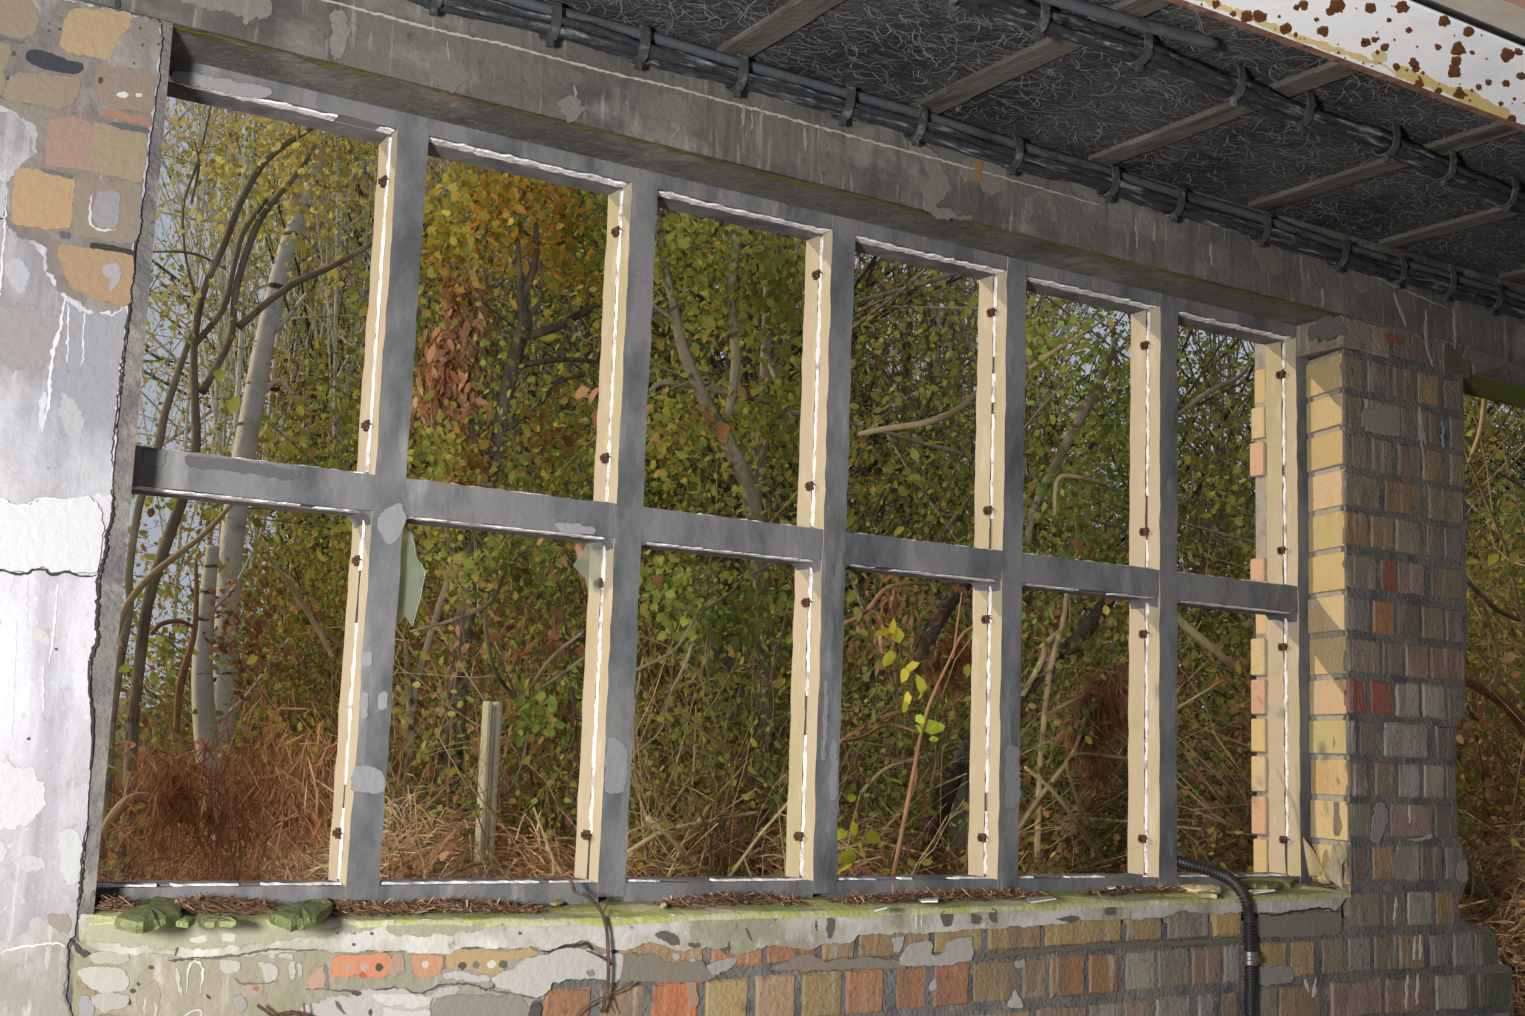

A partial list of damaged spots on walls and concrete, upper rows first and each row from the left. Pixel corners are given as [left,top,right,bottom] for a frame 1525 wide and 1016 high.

flaking render [0,0,272,306]
leakage [0,190,87,443]
flaking render [300,932,638,1016]